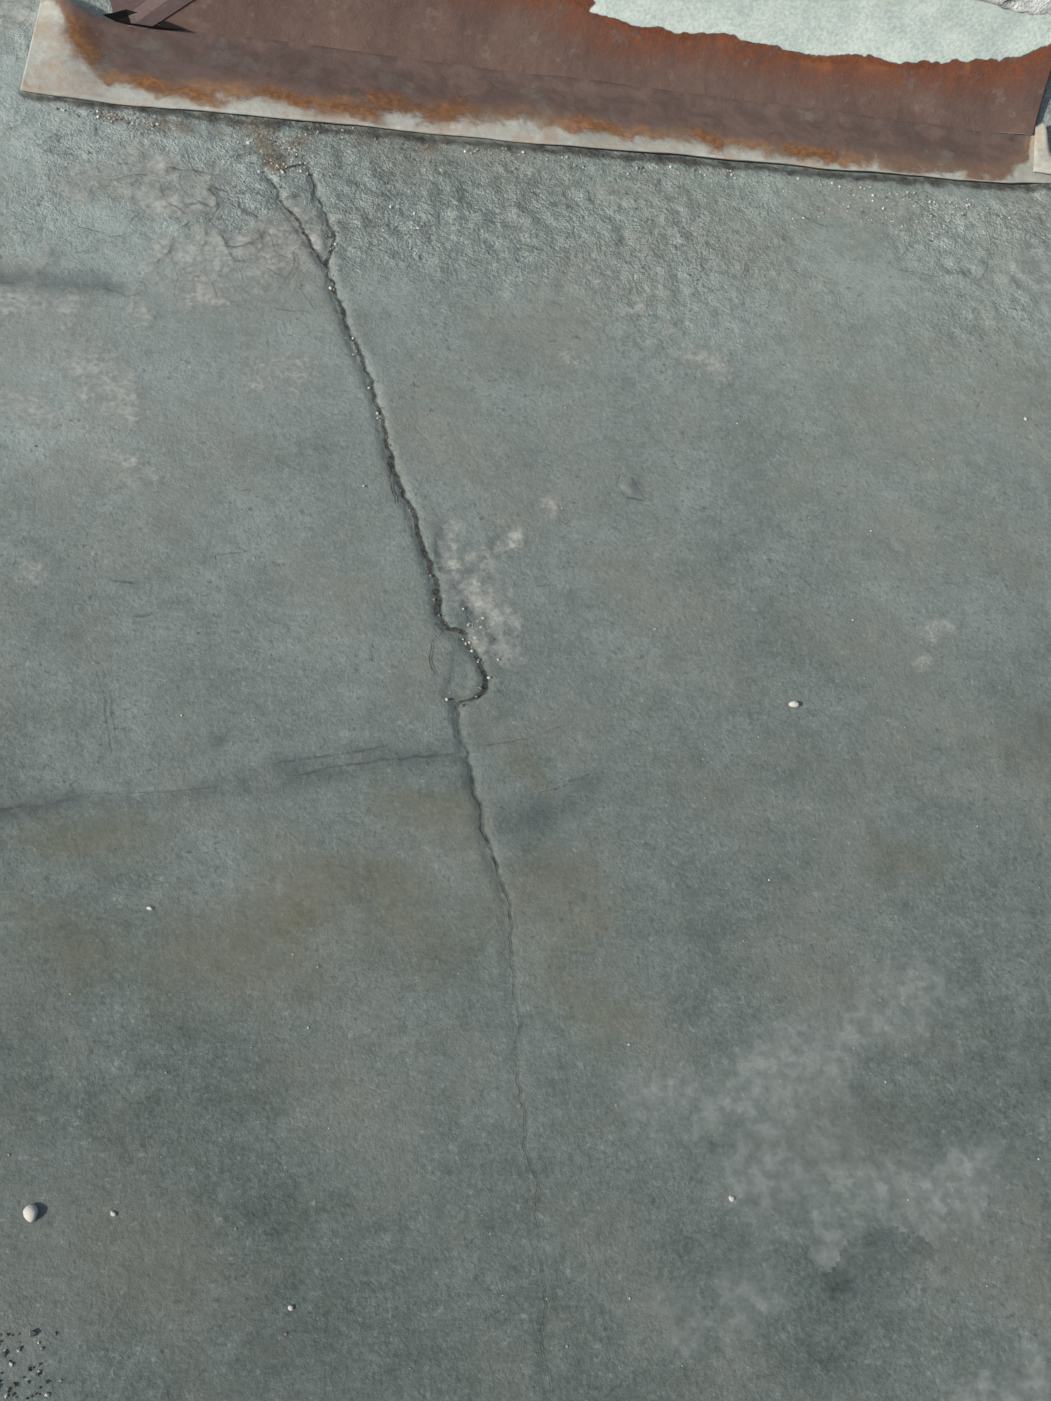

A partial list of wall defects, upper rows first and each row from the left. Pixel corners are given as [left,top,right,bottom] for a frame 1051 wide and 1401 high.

corrosion [56,0,1051,181]
crack [169,153,551,1392]